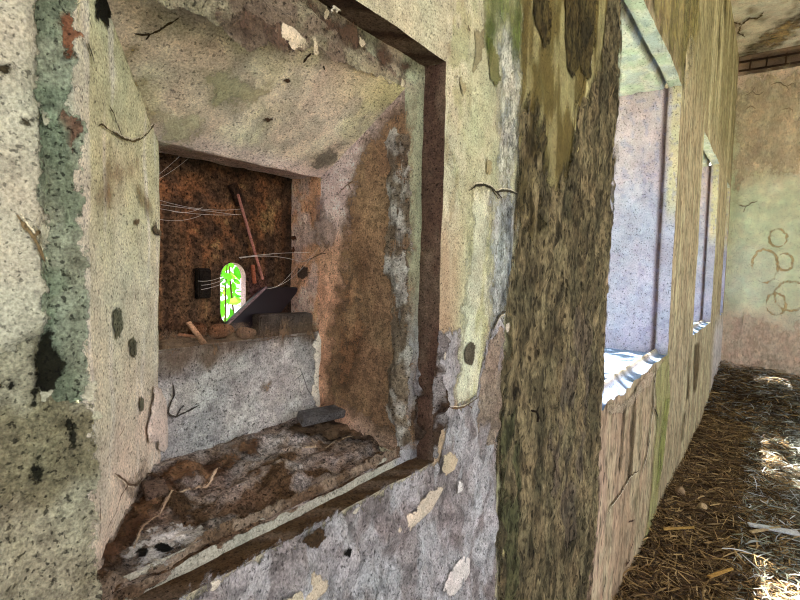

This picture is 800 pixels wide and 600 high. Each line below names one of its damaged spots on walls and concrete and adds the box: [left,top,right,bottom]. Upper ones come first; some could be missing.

crack [134,18,180,40]
spalling [739,24,800,72]
crack [98,107,155,143]
crack [468,182,518,199]
spalling [0,0,413,600]
flaking render [159,0,622,600]